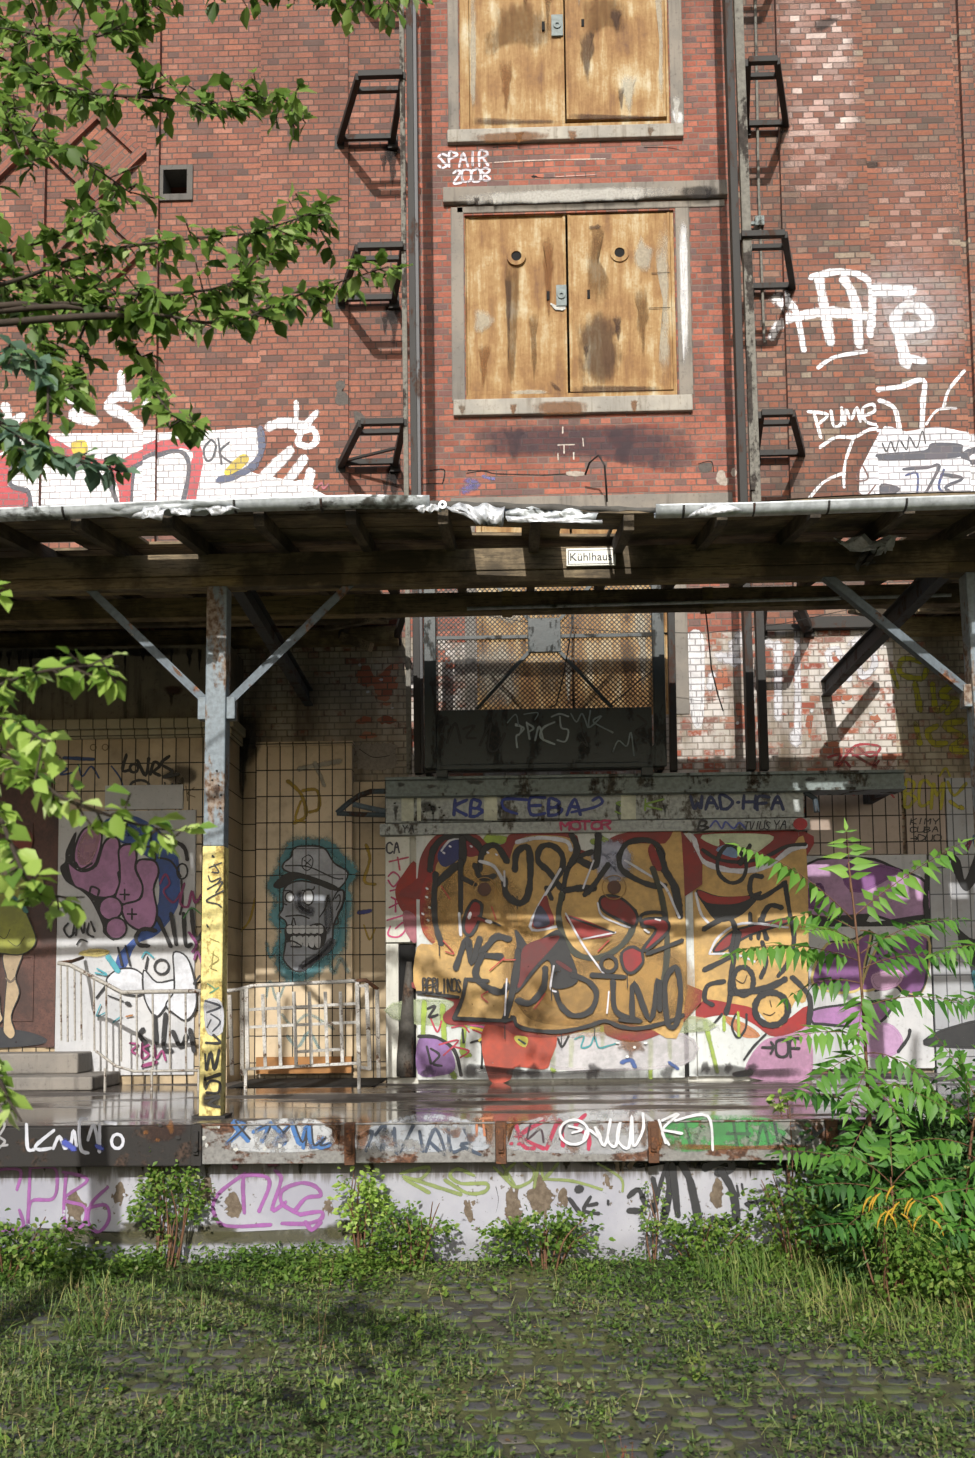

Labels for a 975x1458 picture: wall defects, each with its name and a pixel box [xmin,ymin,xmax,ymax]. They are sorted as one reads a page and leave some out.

peeling [715,668,744,725]
peeling [805,709,839,747]
rust [324,1117,370,1147]
rust [476,1115,523,1142]
peeling [602,1161,637,1189]
peeling [199,1176,242,1218]
peeling [322,1199,334,1216]
peeling [504,1173,571,1235]
peeling [709,1178,725,1209]